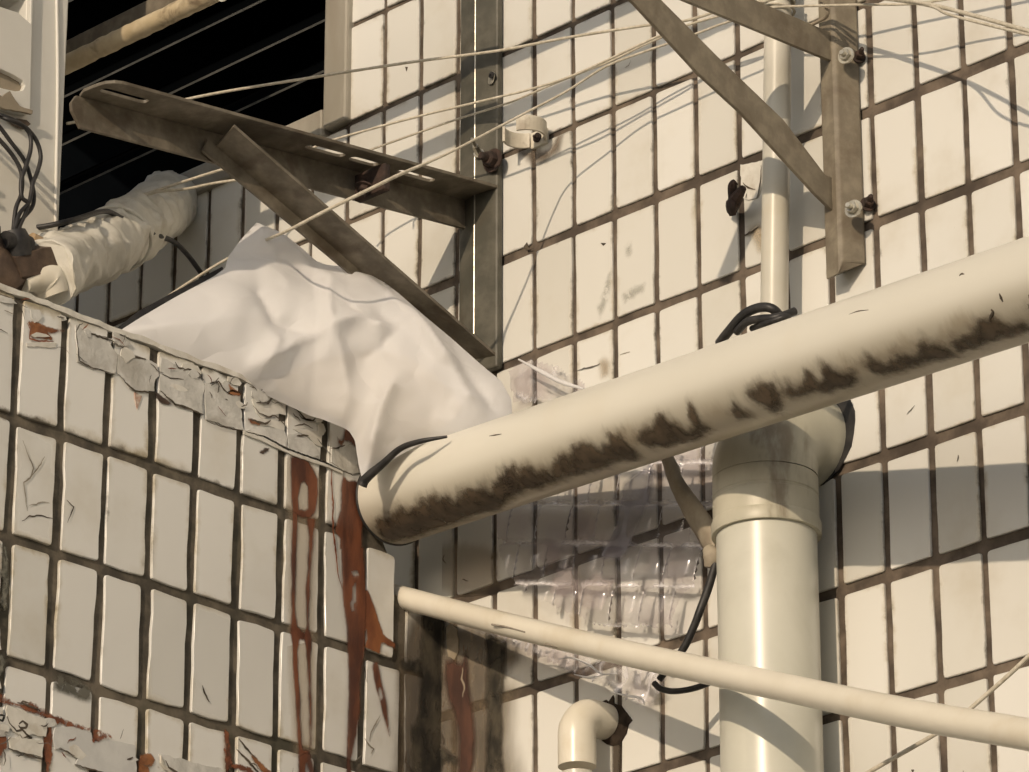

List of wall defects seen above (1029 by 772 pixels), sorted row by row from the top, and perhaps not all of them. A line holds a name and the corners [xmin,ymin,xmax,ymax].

peeling [0,295,43,323]
flaking render [57,315,360,476]
corrosion [338,429,356,447]
spalling [0,544,9,609]
corrosion [290,457,318,772]
corrosion [331,469,395,772]
spalling [54,674,91,700]
damp [398,615,516,772]
peeling [0,700,57,764]
corrosion [138,753,155,772]
corrosion [224,729,271,772]